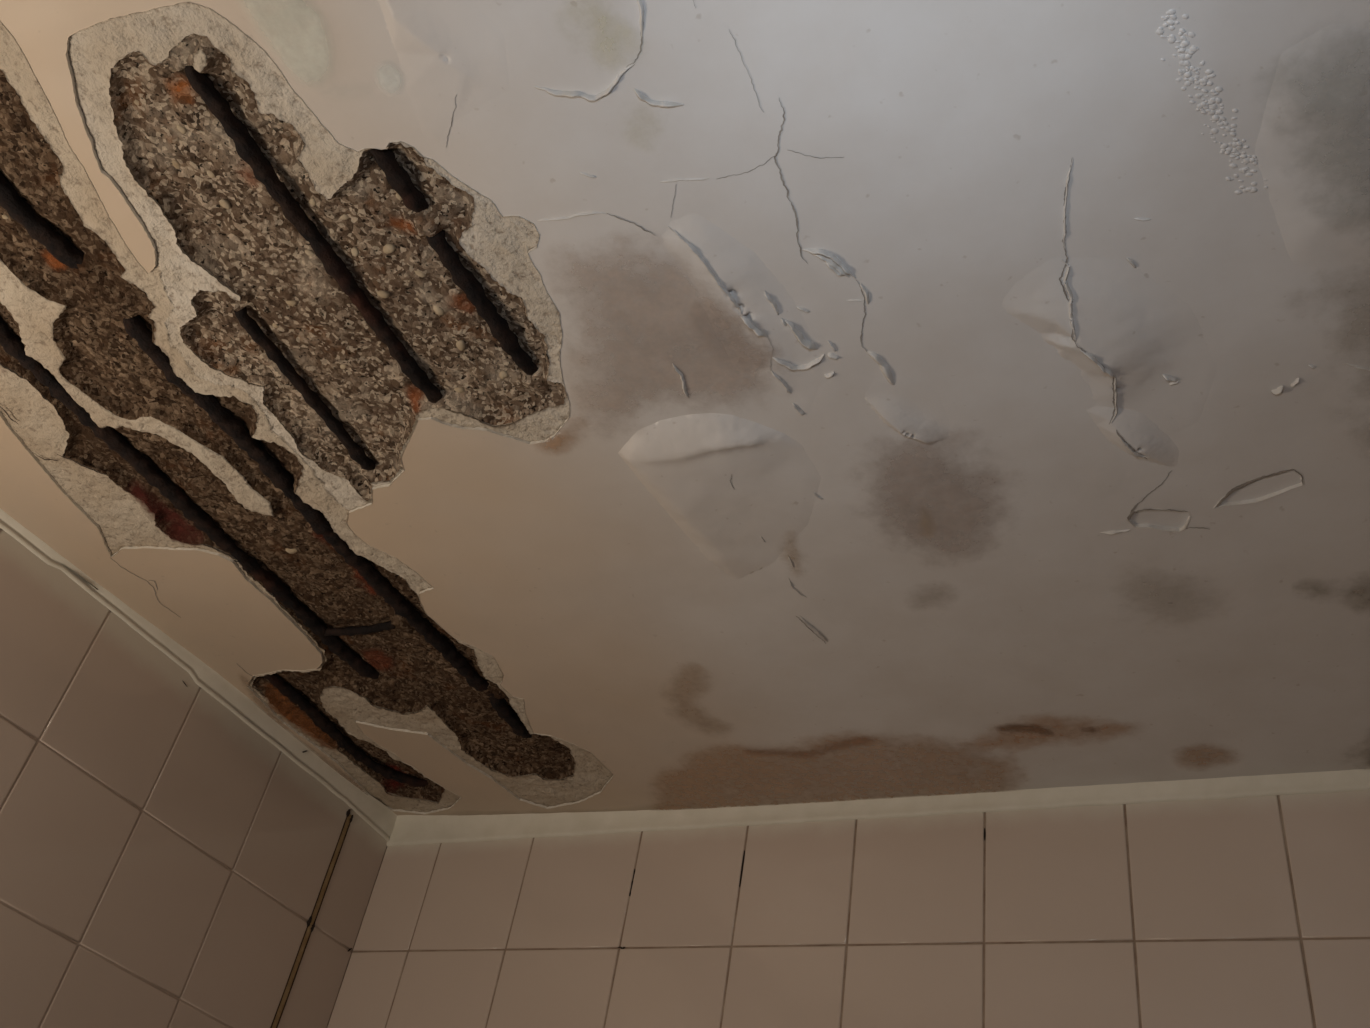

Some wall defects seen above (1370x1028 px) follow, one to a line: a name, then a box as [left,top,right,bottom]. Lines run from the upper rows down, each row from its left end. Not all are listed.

spalling [0,2,614,814]
crack [535,0,644,101]
crack [537,31,895,415]
crack [1059,159,1303,535]
peeling [1213,468,1305,508]
rust [267,684,332,749]